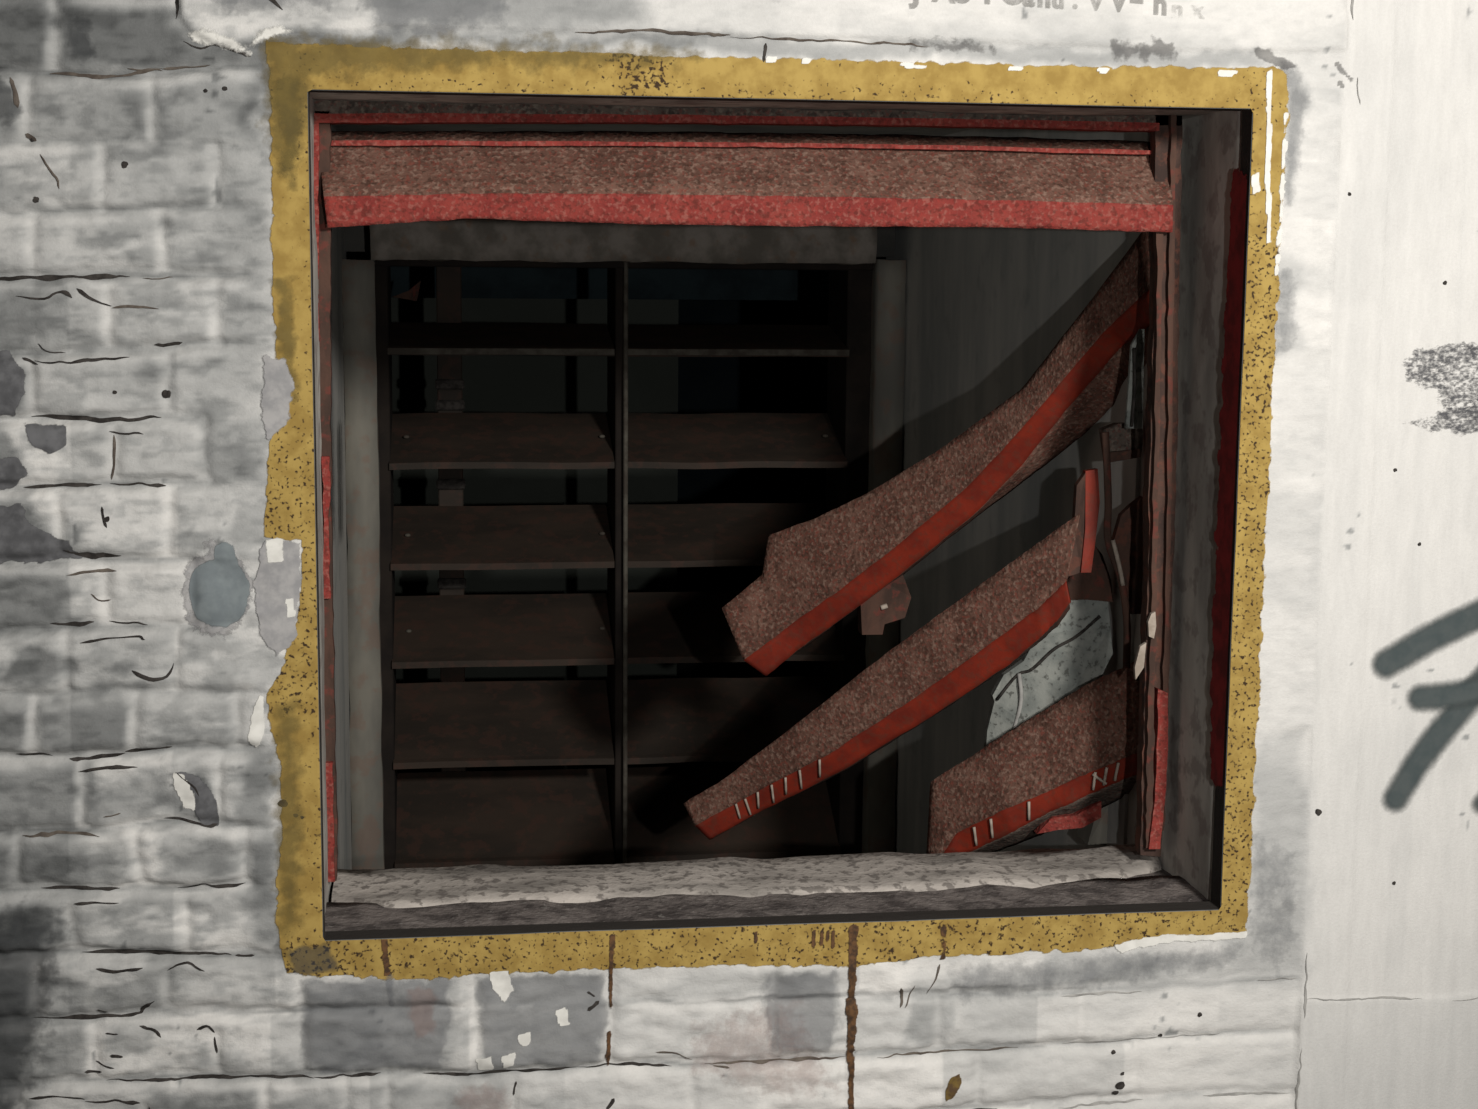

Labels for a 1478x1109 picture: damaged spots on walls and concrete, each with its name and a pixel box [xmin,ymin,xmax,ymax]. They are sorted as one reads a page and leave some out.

peeling [253,538,302,656]
peeling [248,695,265,747]
corrosion [812,924,859,1109]